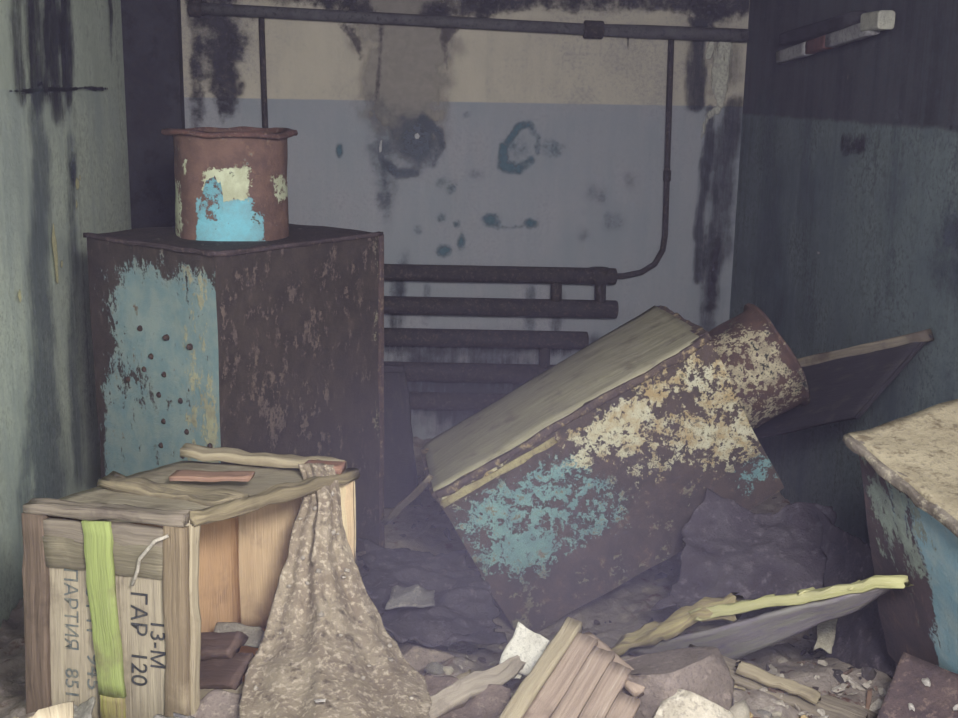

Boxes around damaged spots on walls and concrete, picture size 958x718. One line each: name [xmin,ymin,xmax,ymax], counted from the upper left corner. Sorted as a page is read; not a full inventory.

leakage [190,0,247,128]
leakage [314,0,750,178]
leakage [12,0,74,499]
leakage [437,236,464,257]
leakage [483,214,500,226]
leakage [686,40,742,329]